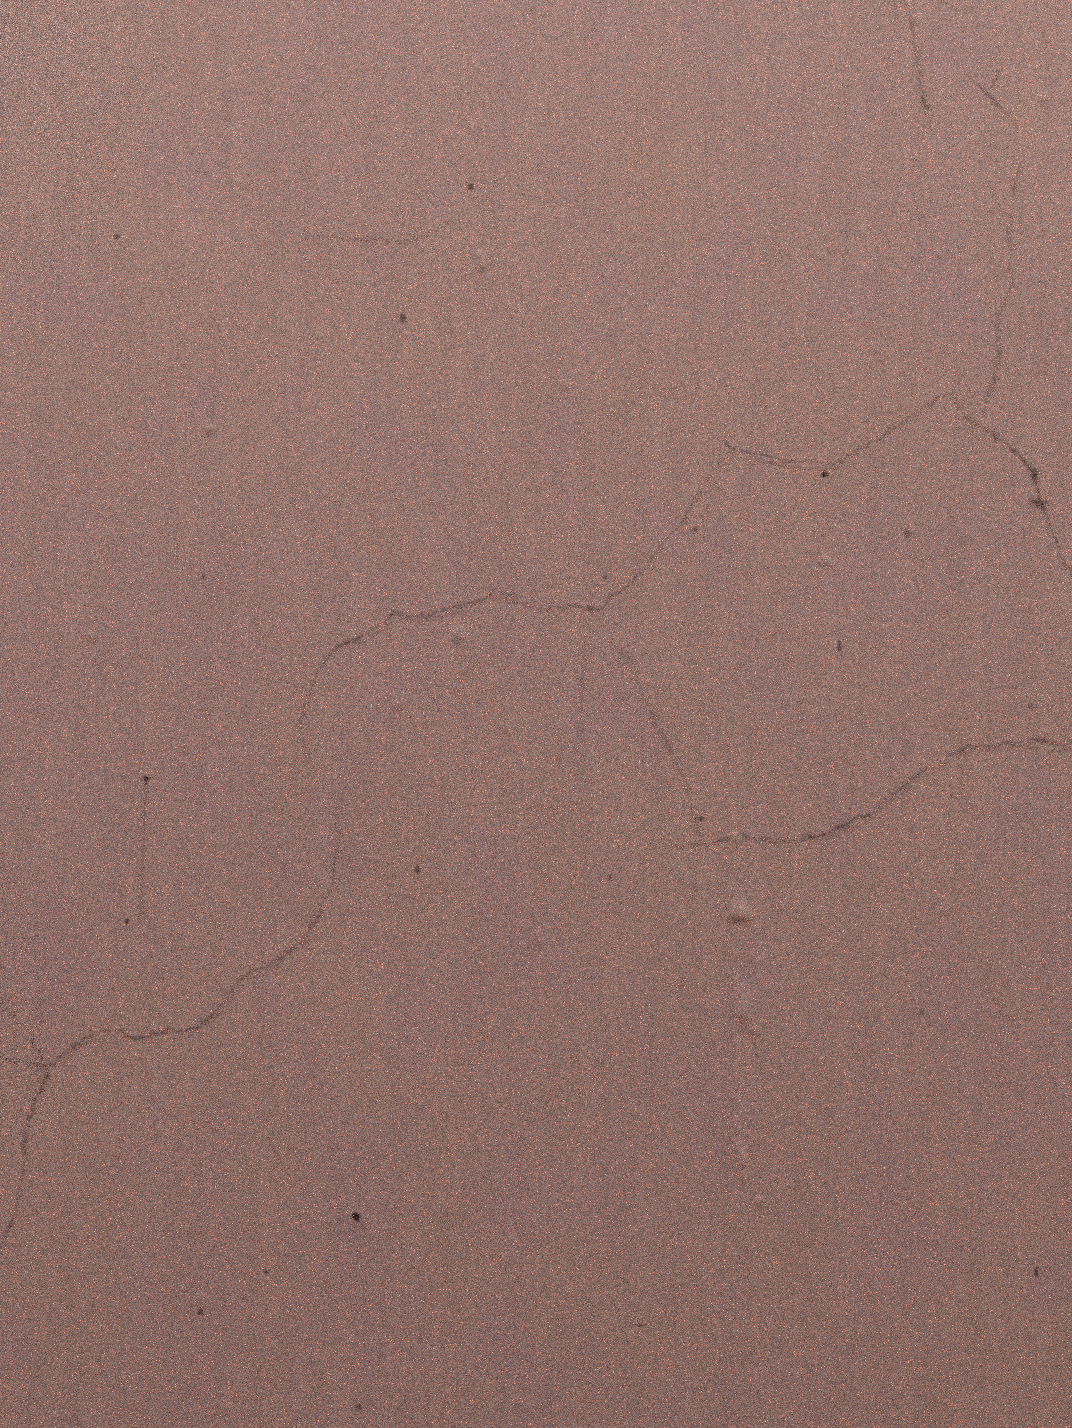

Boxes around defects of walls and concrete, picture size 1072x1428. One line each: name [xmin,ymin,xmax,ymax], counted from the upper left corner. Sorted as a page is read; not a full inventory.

crack [346,590,592,647]
crack [824,739,1072,840]
crack [0,938,307,1257]